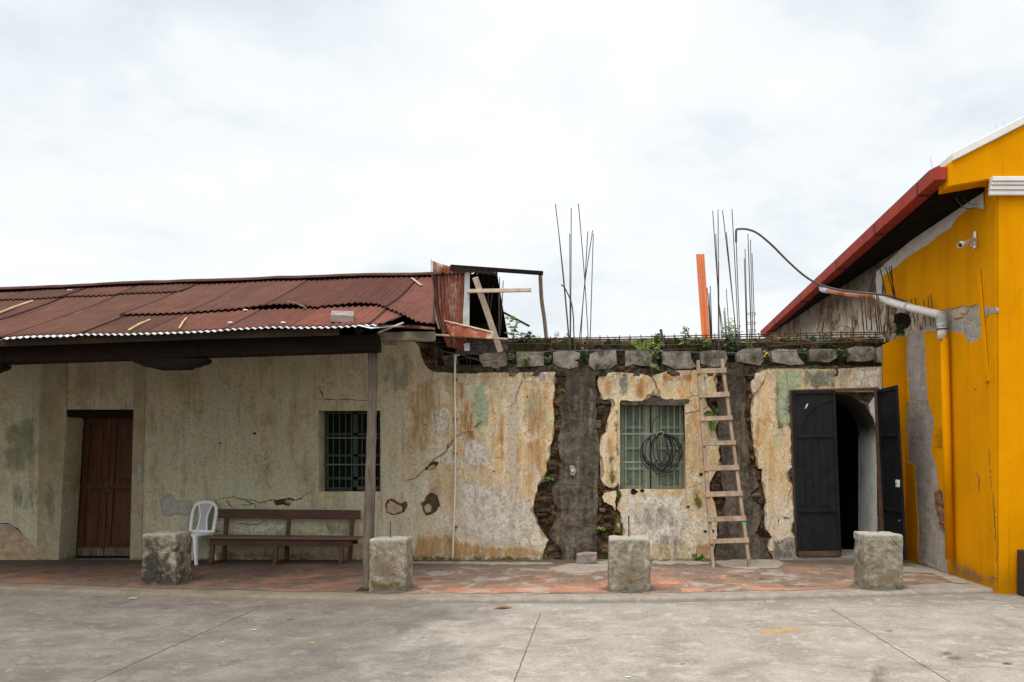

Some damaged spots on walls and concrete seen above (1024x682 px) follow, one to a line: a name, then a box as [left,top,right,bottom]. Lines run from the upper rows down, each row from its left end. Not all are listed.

corrosion [430,258,498,351]
flaking render [744,364,767,430]
peeling [822,193,999,574]
flaking render [0,524,36,560]
crack [215,488,315,532]
flaking render [421,493,440,516]
crack [407,421,482,481]
leakage [458,382,535,549]
flaking render [534,376,565,560]
flaking render [597,479,623,551]
flaking render [710,475,725,516]
flaking render [749,450,796,560]